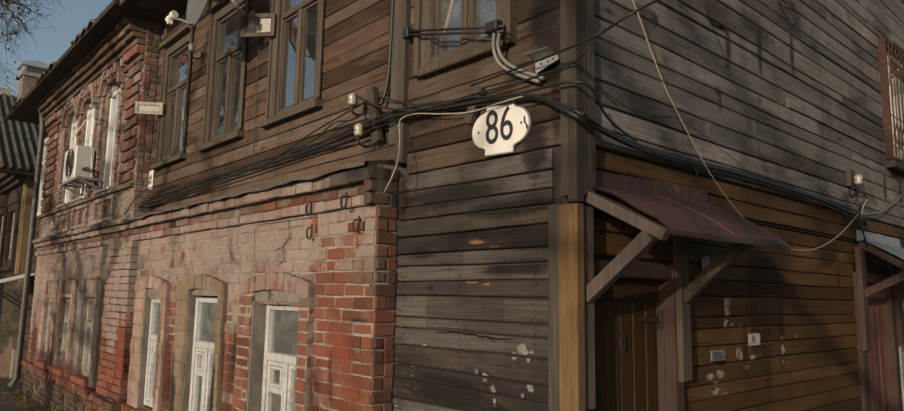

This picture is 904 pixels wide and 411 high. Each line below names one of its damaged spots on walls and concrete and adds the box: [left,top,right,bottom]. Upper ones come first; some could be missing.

peeling [723,298,742,327]
peeling [512,343,533,363]
peeling [706,370,728,397]